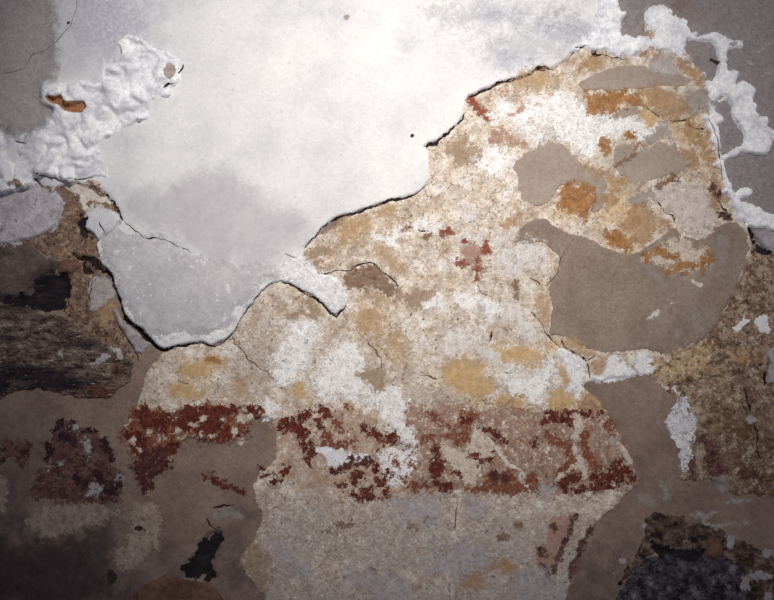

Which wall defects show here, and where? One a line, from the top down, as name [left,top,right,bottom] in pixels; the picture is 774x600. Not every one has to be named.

crack [0,1,77,75]
peeling [163,63,176,79]
peeling [467,138,517,184]
peeling [485,86,661,168]
water stain [642,121,673,147]
water stain [684,88,715,116]
crack [33,172,190,252]
peeling [639,172,733,287]
flaking render [0,178,183,400]
spalling [23,197,774,584]
flaking render [127,527,224,600]
flaking render [613,512,774,600]